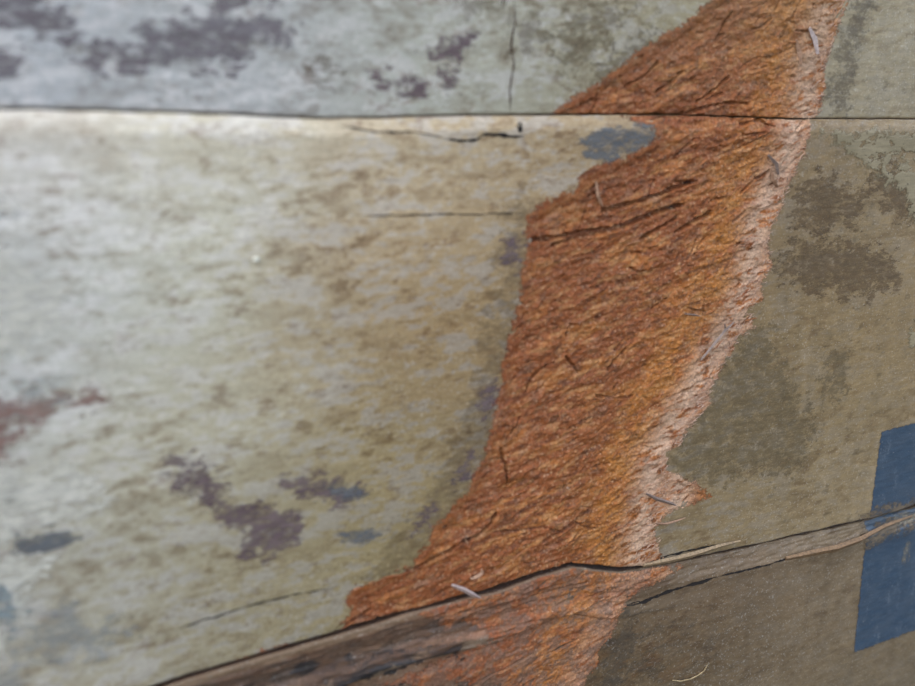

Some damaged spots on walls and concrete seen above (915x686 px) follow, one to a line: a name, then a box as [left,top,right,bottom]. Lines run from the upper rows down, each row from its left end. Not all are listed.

crack [342,7,525,143]
crack [648,544,718,563]
crack [626,558,786,606]
crack [176,587,331,630]